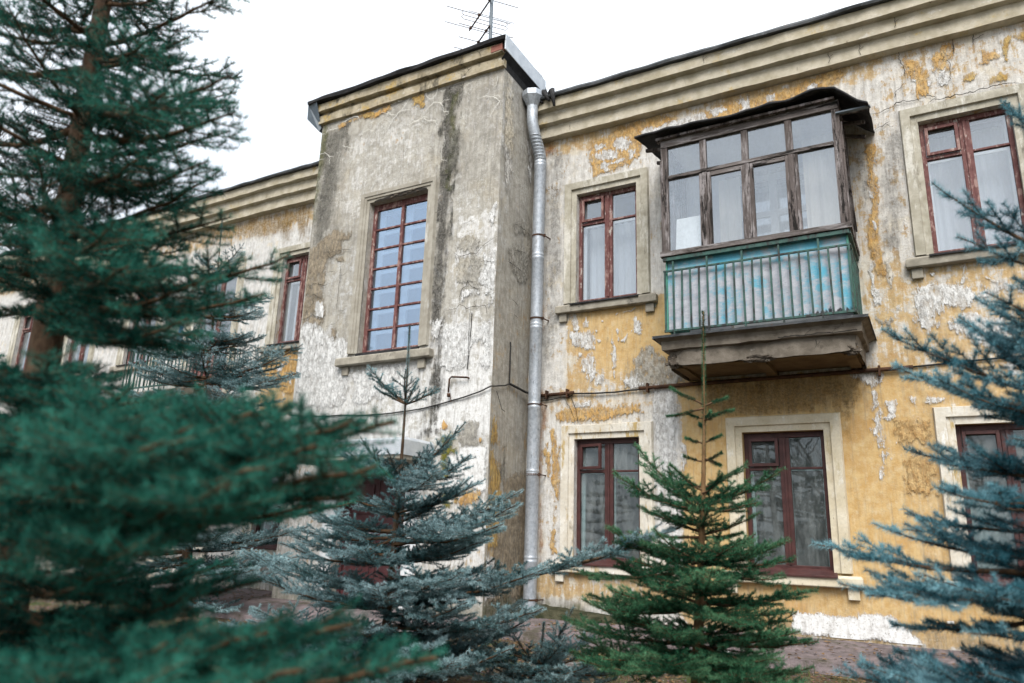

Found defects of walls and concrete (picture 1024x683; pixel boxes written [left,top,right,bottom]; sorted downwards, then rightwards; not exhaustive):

peeling [586,69,844,178]
peeling [902,42,955,100]
crack [874,17,1022,128]
peeling [964,32,1024,84]
water stain [432,84,462,322]
peeling [264,229,409,410]
peeling [430,217,531,372]
peeling [912,265,1024,354]
water stain [420,334,442,435]
peeling [543,308,687,507]
peeling [850,369,938,497]
peeling [549,529,557,555]